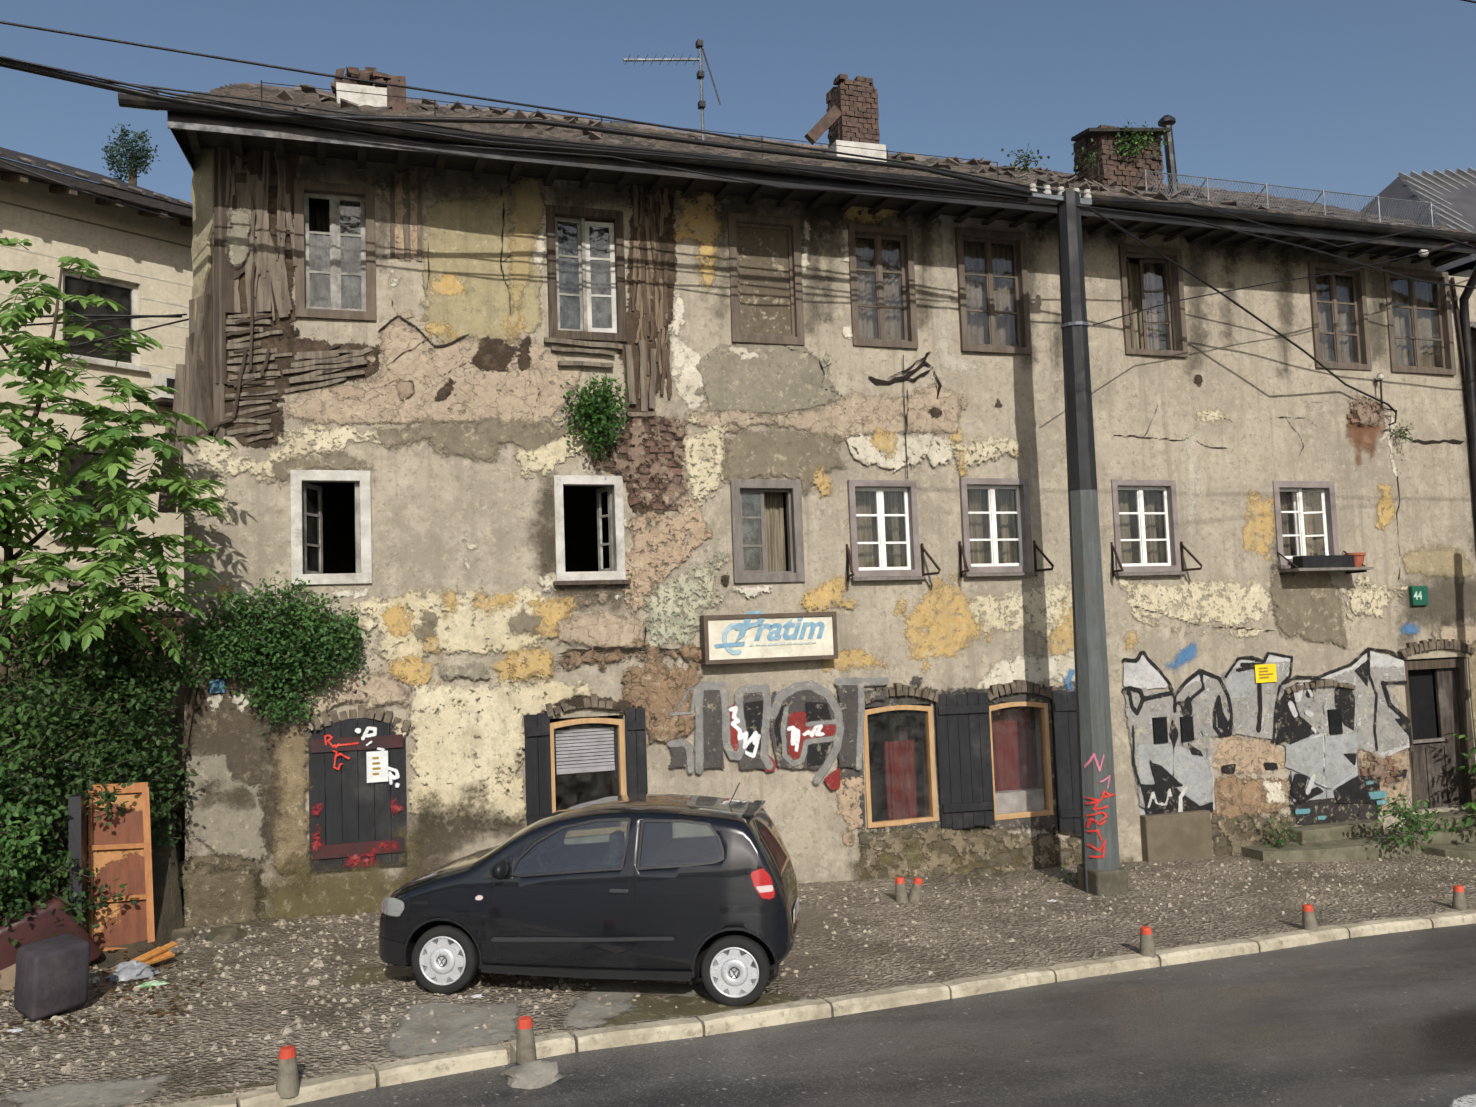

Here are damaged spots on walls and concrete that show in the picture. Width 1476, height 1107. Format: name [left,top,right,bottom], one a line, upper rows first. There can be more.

crack [378,300,468,401]
crack [784,345,942,432]
rust [1347,422,1382,463]
flaking render [178,176,1024,926]
peeling [1242,490,1276,569]
damp [184,674,281,851]
flaking render [819,572,1082,879]